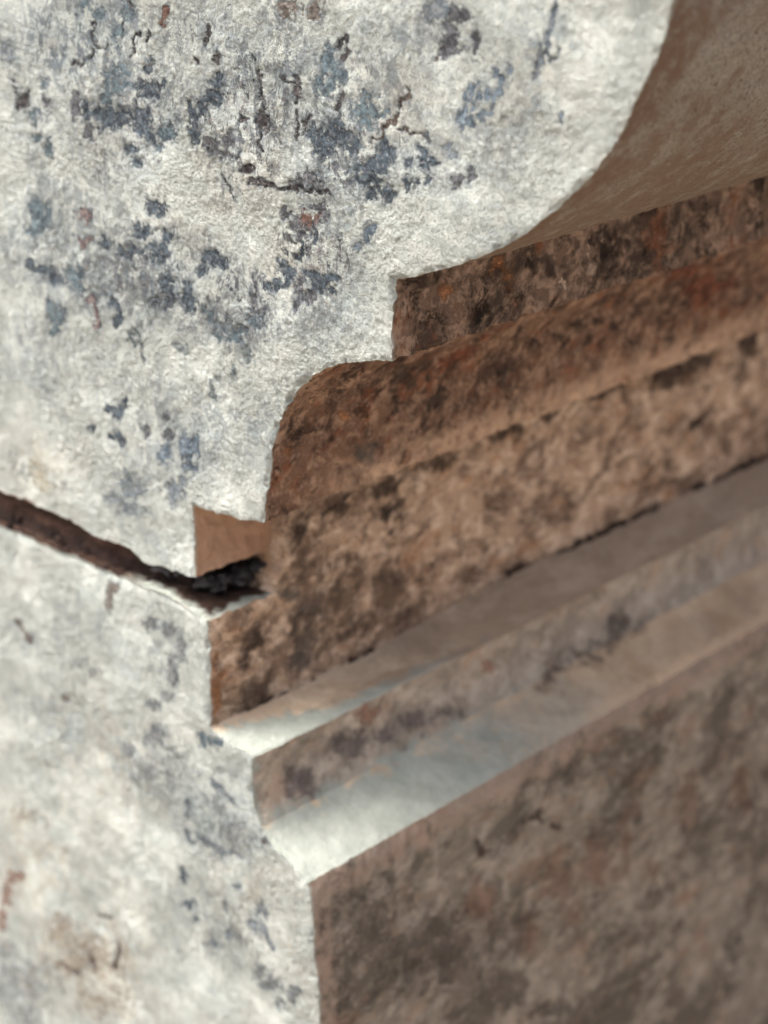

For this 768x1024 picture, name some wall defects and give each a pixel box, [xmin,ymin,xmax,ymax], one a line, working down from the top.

corrosion [399,272,453,300]
corrosion [527,255,566,290]
leakage [478,424,524,445]
leakage [542,410,564,424]
leakage [369,453,456,536]
corrosion [211,653,231,724]